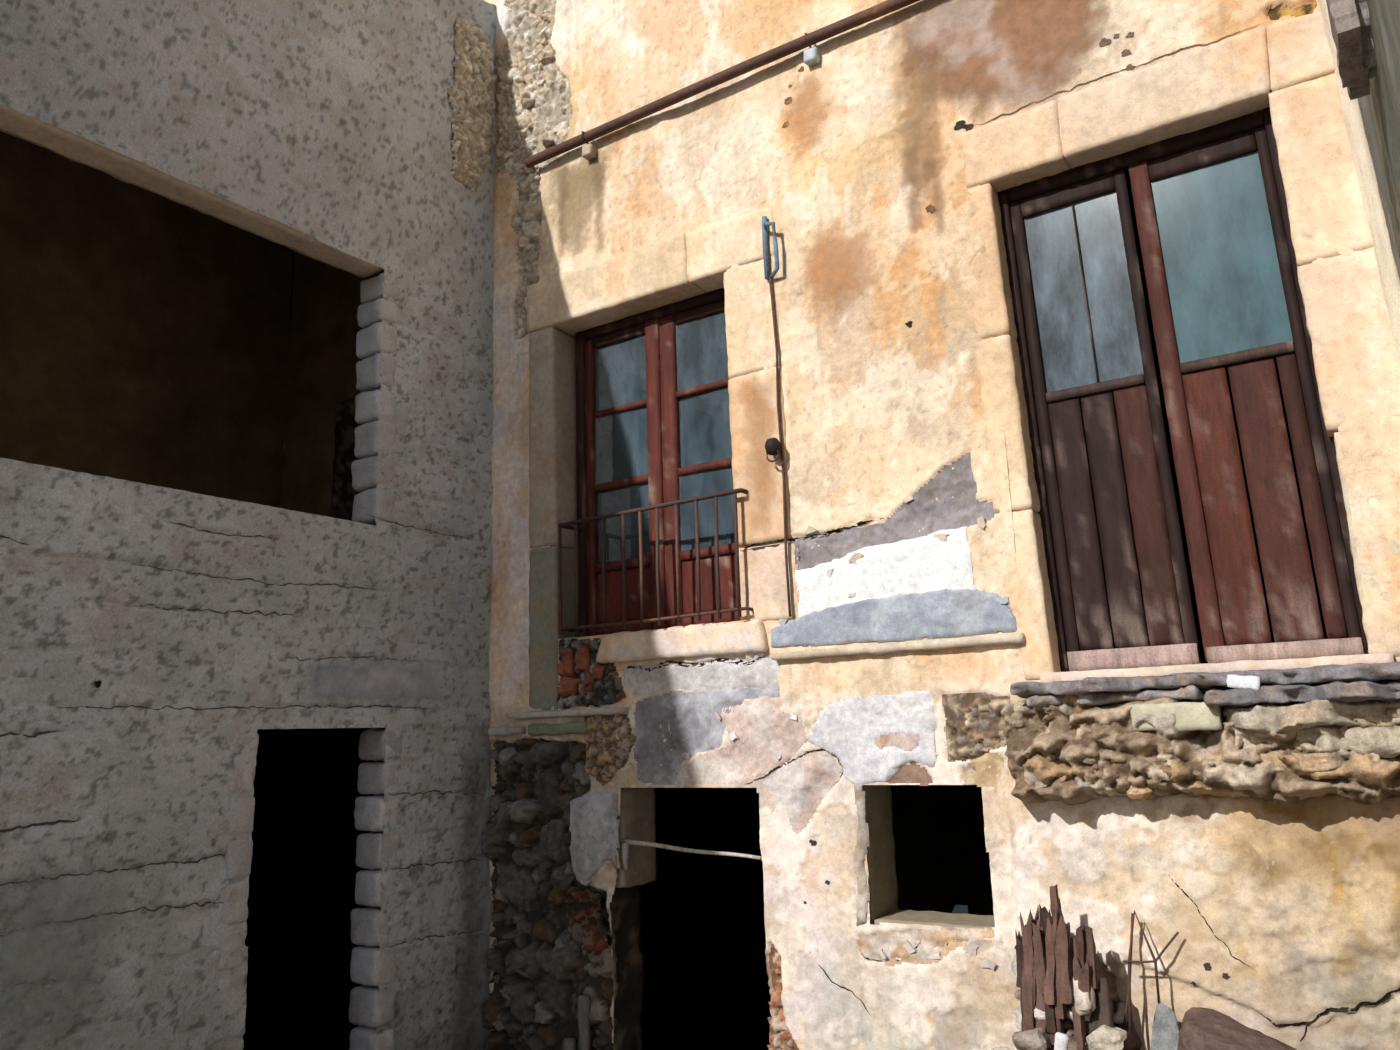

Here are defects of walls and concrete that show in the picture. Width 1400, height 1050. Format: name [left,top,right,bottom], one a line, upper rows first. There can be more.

spalling [1267,0,1317,21]
leakage [903,0,1103,210]
crack [968,21,1270,129]
spalling [447,0,573,339]
flaking render [778,452,999,625]
flaking render [561,647,808,785]
spalling [888,763,933,786]
spalling [942,692,1010,787]
flaking render [1226,675,1260,690]
spalling [853,782,996,970]
crack [1171,878,1255,970]
crack [1253,988,1400,1041]